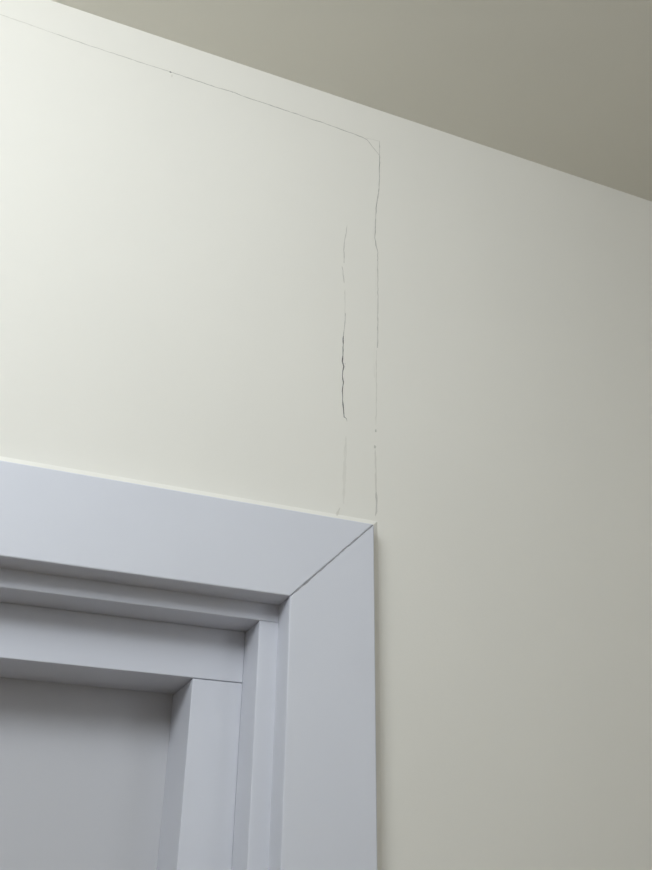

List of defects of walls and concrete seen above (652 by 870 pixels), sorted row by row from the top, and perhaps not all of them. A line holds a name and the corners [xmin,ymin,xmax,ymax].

crack [0,14,380,595]